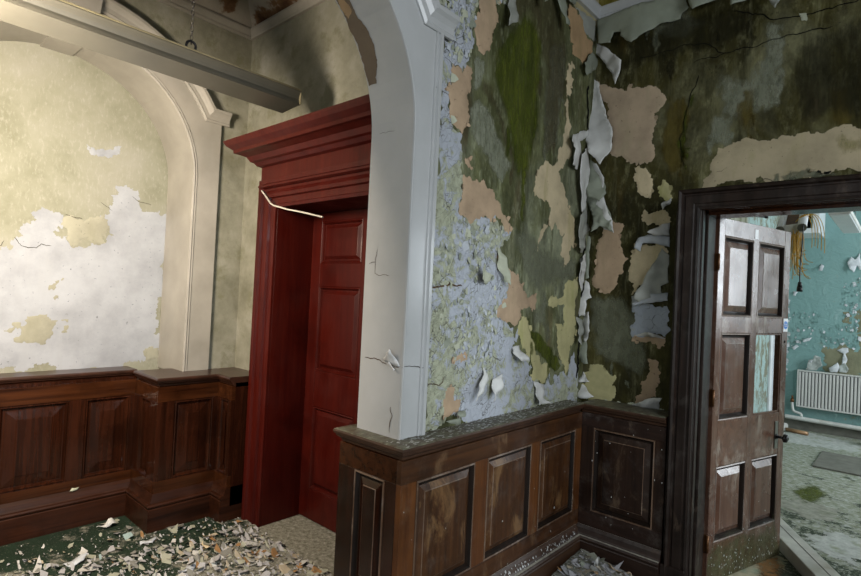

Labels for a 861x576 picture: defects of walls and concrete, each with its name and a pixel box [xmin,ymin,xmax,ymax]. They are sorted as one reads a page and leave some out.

damp [628,11,753,77]
damp [707,24,784,152]
crack [641,0,859,165]
peeling [0,185,166,372]
damp [471,102,575,333]
peeling [425,0,714,432]
flaking render [702,124,861,188]
damp [774,169,823,181]
flaking render [786,253,861,376]